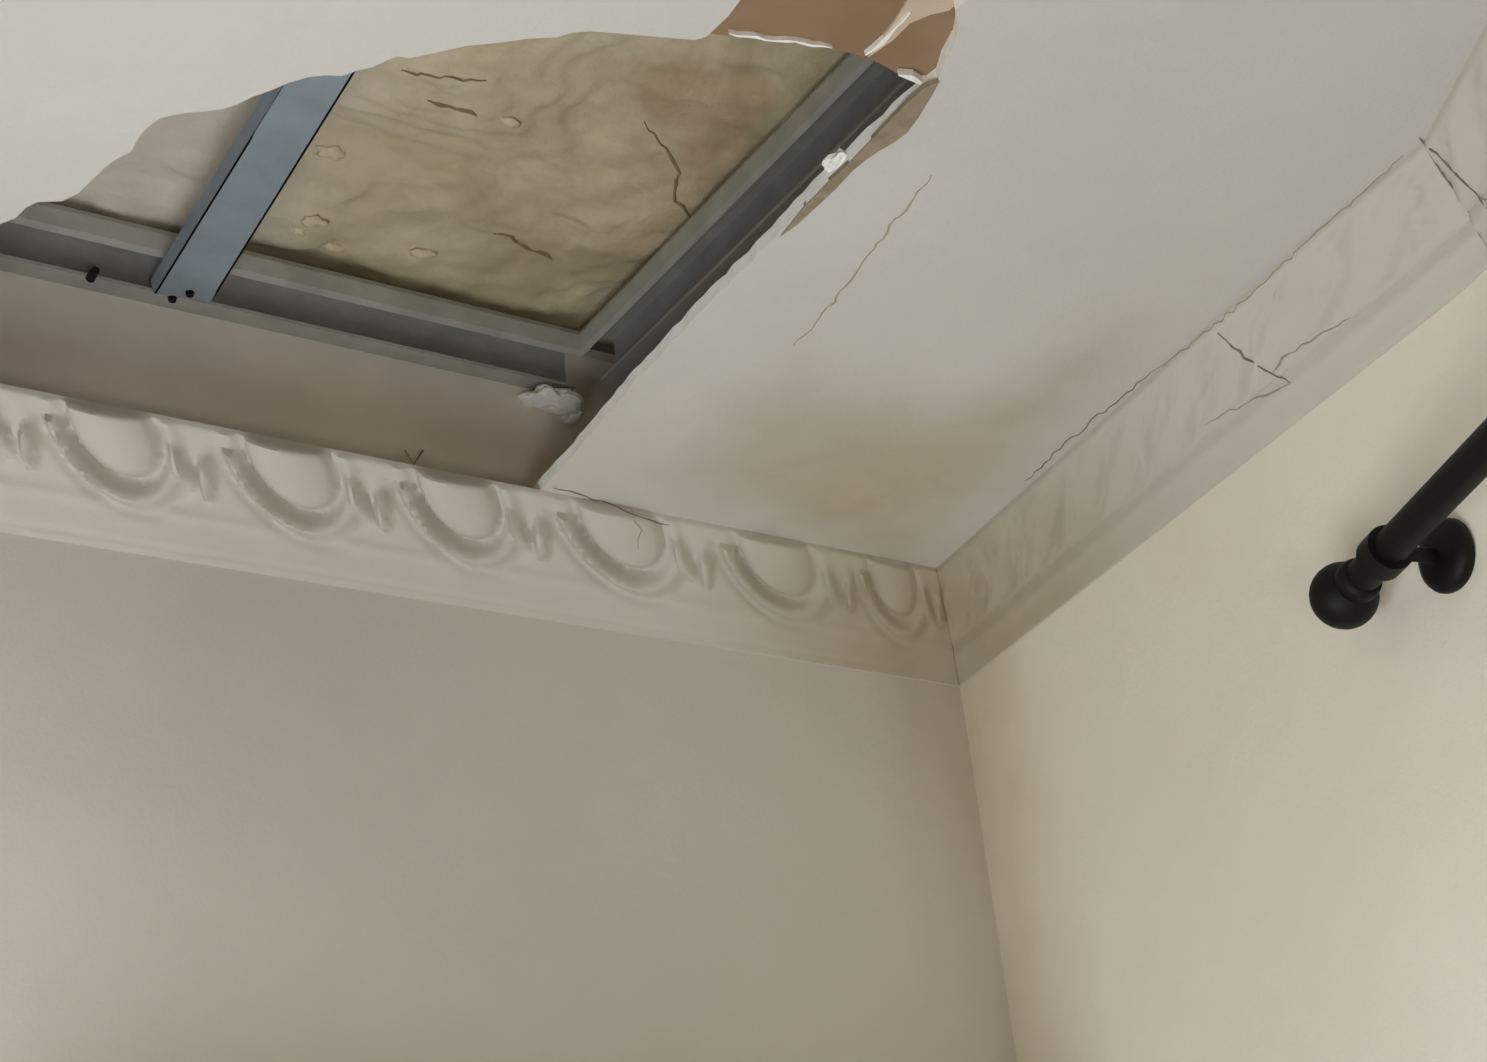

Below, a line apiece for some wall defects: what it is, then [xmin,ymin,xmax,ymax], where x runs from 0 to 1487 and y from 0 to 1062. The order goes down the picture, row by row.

peeling [710,0,956,236]
flaking render [516,384,583,425]
crack [794,175,932,345]
crack [1025,138,1487,481]